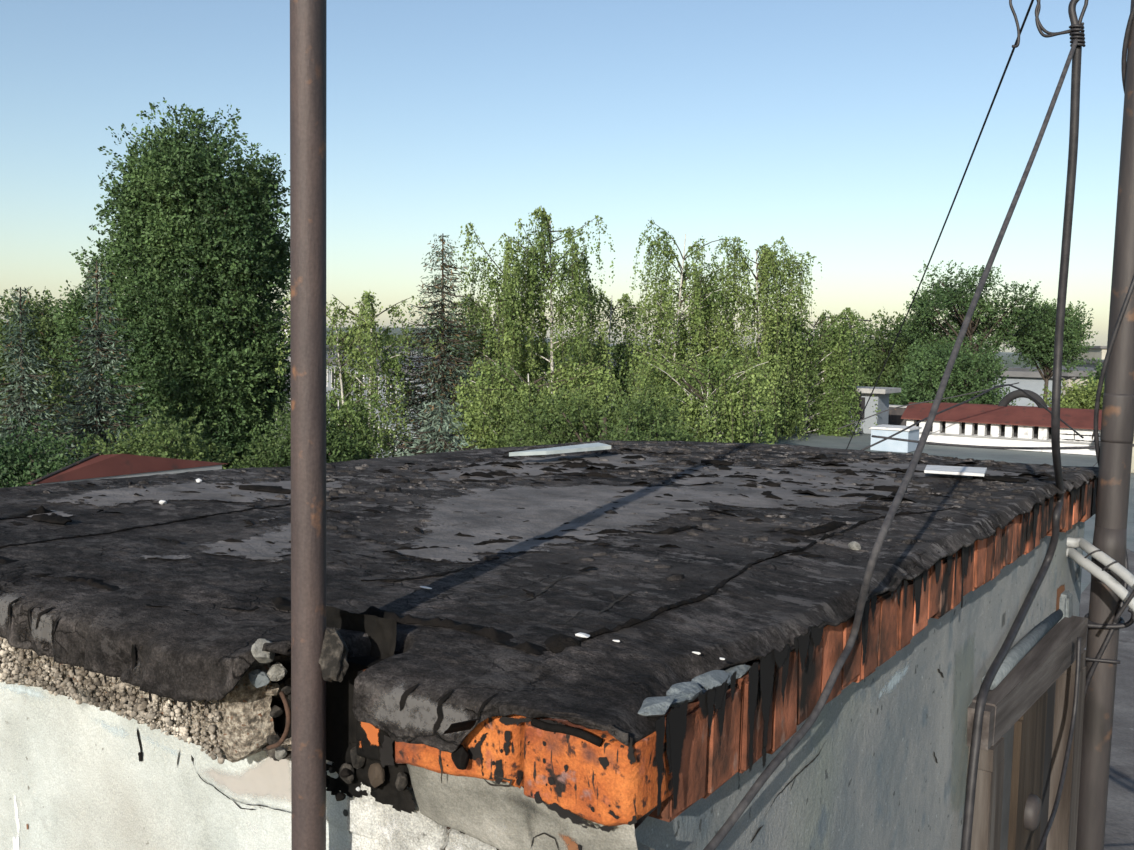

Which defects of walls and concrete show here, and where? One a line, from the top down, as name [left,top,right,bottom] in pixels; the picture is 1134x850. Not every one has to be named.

peeling [10,475,291,573]
spalling [326,606,397,659]
crack [359,526,698,655]
crack [425,461,951,642]
peeling [326,448,1066,585]
spalling [0,638,291,813]
peeling [468,716,564,787]
peeling [534,765,637,832]
peeling [627,737,636,765]